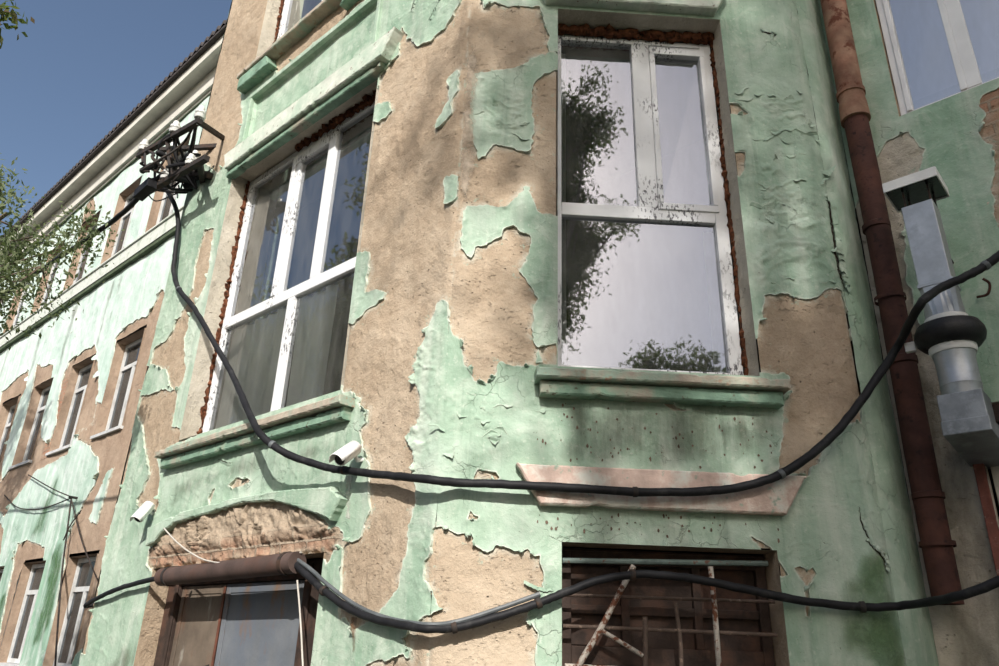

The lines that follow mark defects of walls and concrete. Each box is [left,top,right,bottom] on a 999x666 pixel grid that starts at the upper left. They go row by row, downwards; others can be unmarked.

peeling [978,89,999,227]
peeling [0,229,214,654]
peeling [148,0,557,637]
peeling [754,289,860,477]
peeling [368,511,543,666]
crack [859,506,891,572]